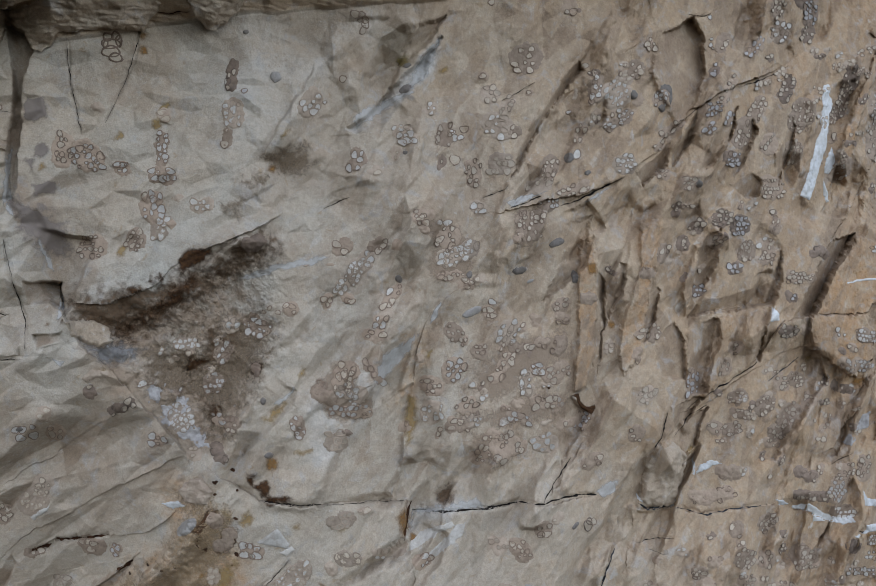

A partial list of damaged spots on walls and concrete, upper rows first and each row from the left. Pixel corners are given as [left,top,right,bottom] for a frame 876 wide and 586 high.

water stain [61,231,282,440]
crack [265,459,597,540]
crack [638,503,761,516]